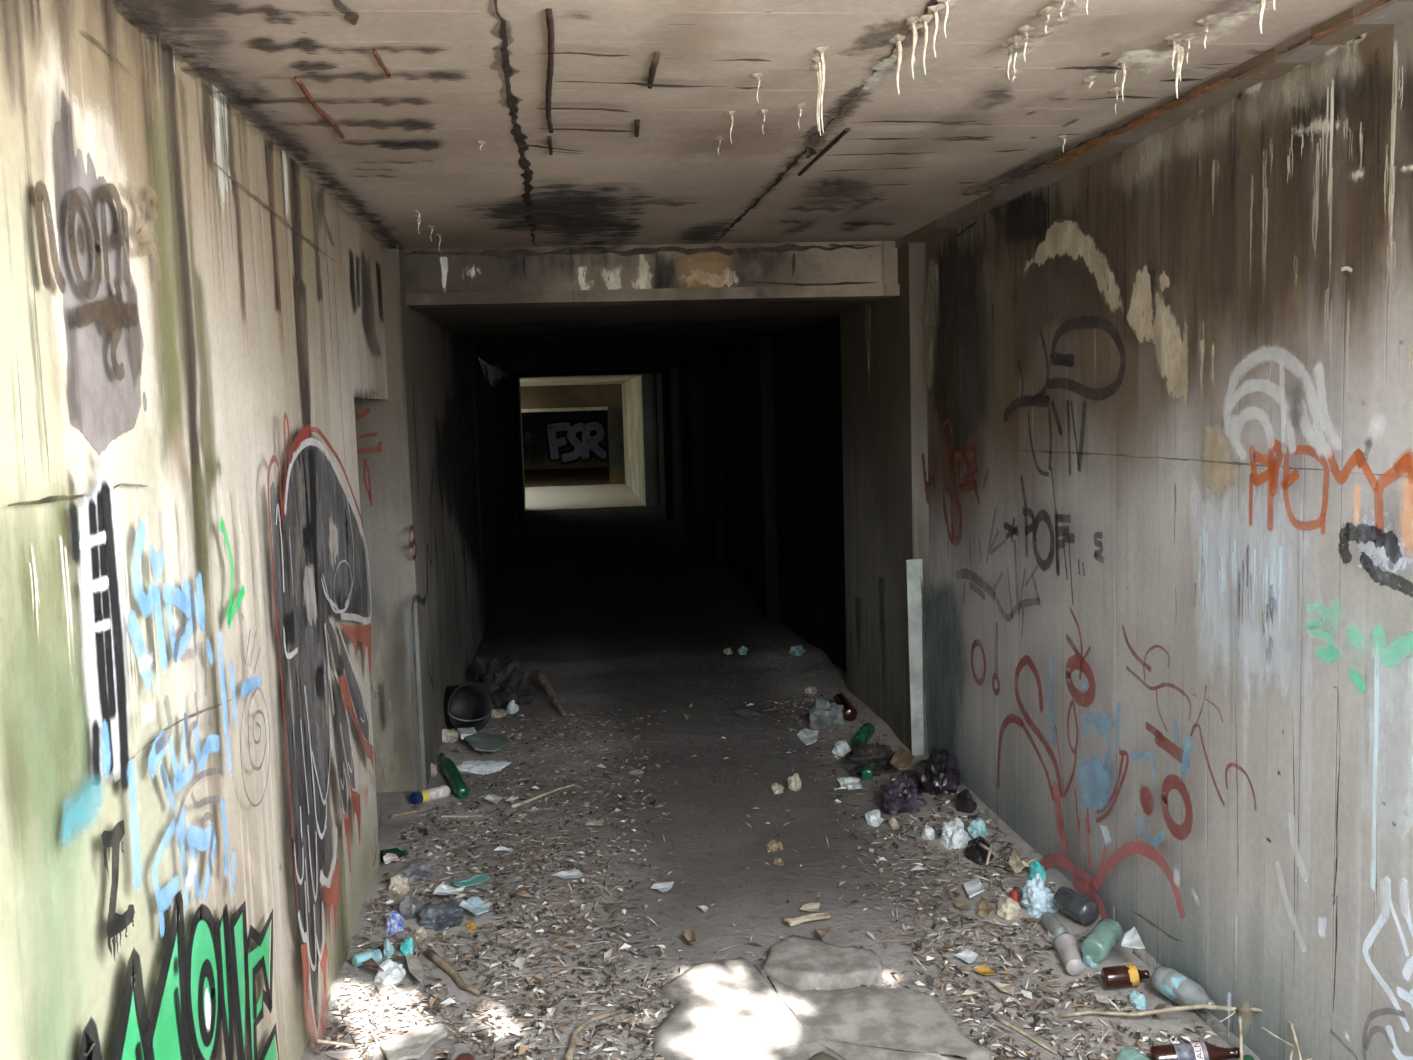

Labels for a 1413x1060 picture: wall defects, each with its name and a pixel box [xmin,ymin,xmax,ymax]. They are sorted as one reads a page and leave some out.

crack [404,0,1028,286]
water stain [926,33,1413,465]
water stain [1094,0,1260,74]
rust [963,0,1391,196]